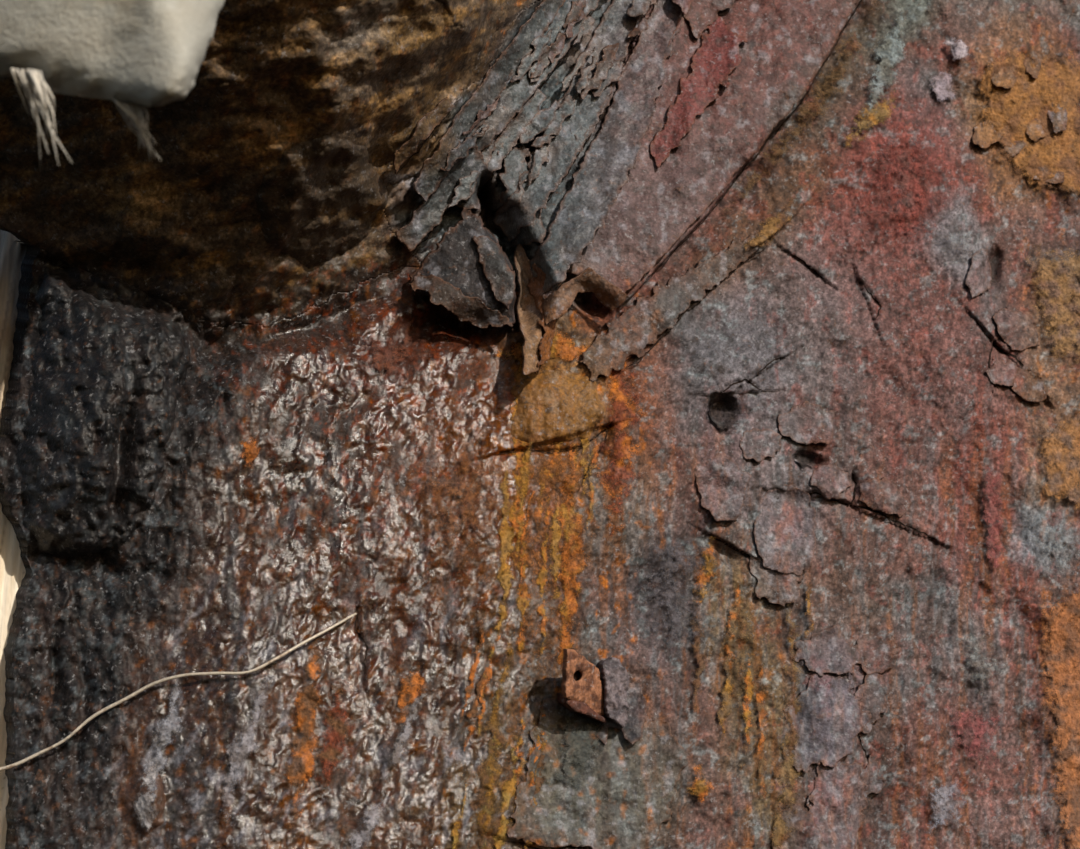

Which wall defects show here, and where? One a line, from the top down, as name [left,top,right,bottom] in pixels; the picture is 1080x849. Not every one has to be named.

rust [972,46,1080,199]
peeling [407,272,514,332]
peeling [579,233,762,382]
rust [1020,243,1080,363]
crack [723,358,781,392]
rust [407,361,643,849]
crack [504,424,611,478]
crack [708,534,751,559]
peeling [694,394,911,606]
crack [809,474,936,540]
rust [1036,414,1080,509]
peeling [772,624,890,849]